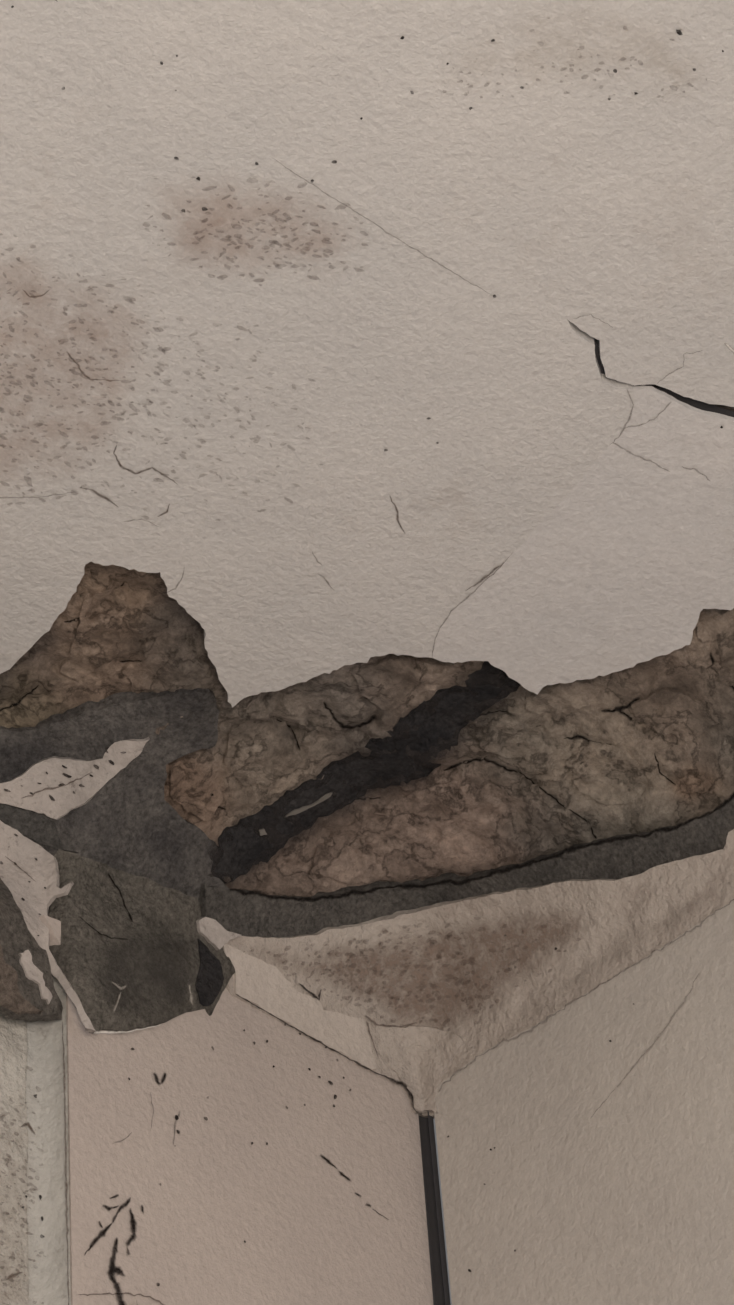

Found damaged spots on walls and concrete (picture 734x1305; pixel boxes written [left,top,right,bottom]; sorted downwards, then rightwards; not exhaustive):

crack [578,316,604,374]
crack [613,351,734,480]
spalling [0,562,734,1071]
crack [23,1024,163,1305]